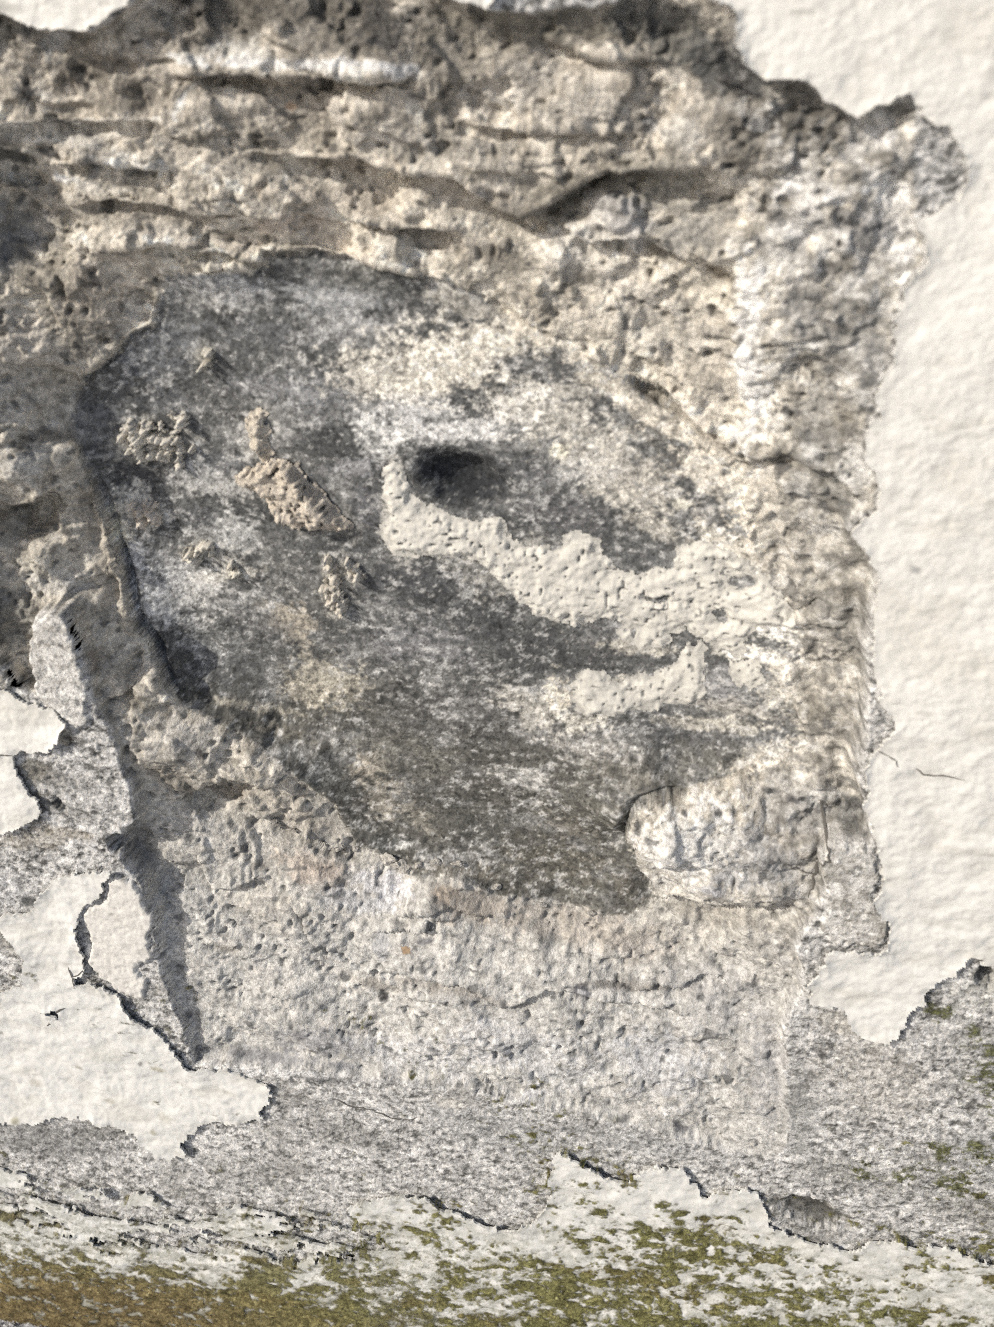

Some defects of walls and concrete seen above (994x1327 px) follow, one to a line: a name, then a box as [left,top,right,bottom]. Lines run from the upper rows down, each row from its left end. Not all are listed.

spalling [908,93,968,229]
spalling [0,0,928,951]
peeling [0,695,190,1070]
damp [0,1243,414,1327]
peeling [0,1051,784,1264]
peeling [781,908,994,1265]